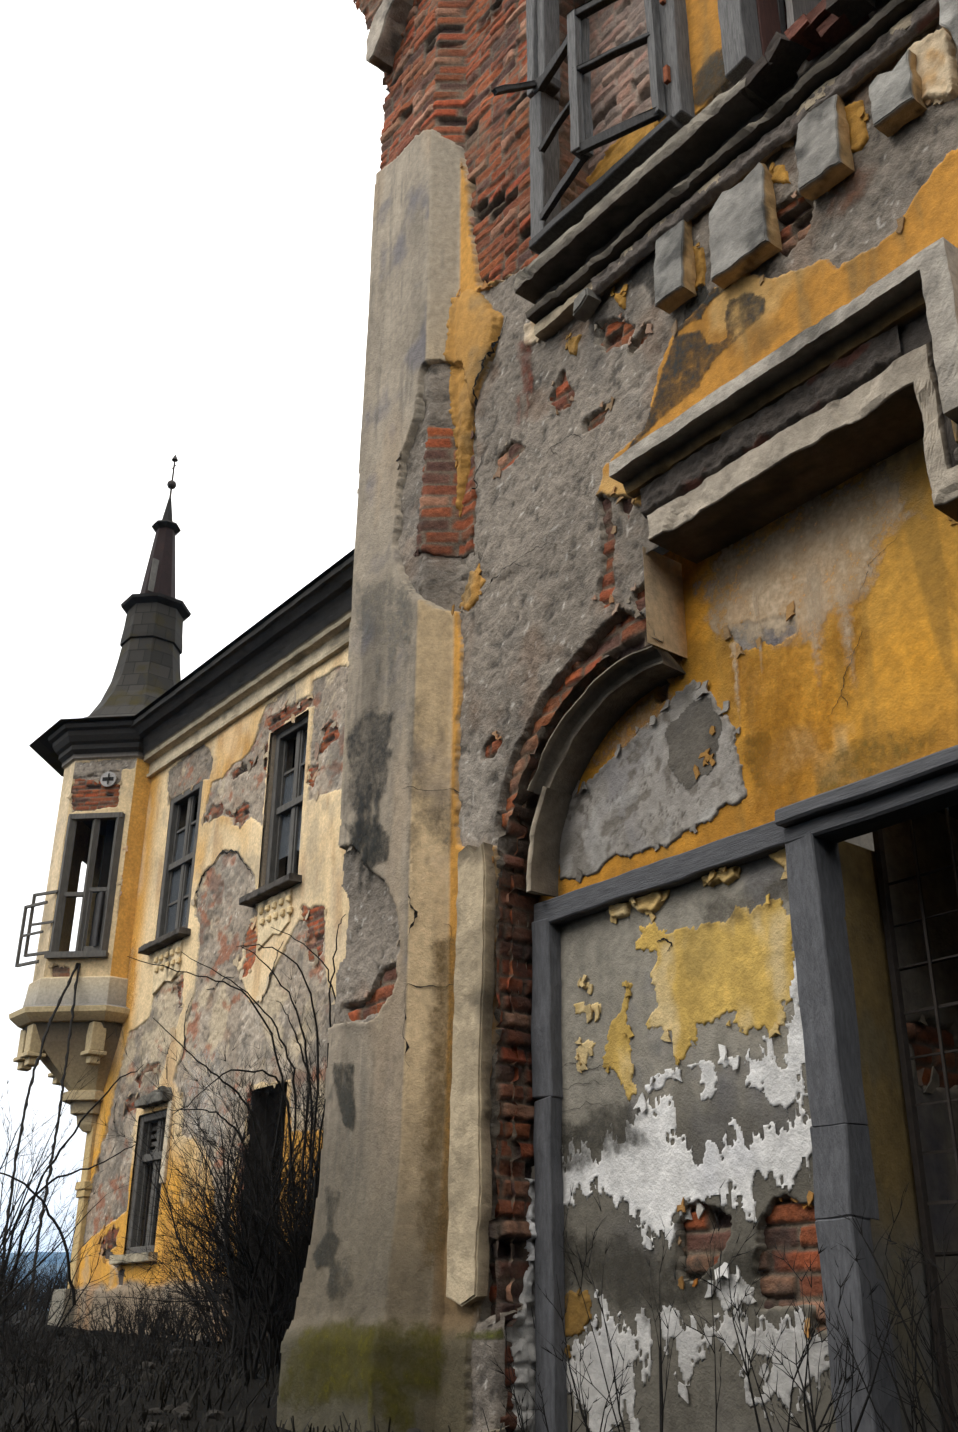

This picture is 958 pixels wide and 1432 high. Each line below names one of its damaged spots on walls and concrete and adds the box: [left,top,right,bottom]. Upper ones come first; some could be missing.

flaking render [868,0,891,18]
flaking render [750,21,958,286]
flaking render [67,758,137,812]
leakage [347,713,392,887]
flaking render [353,0,718,1432]
peeling [559,658,747,883]
peeling [723,600,797,659]
flaking render [84,845,400,1285]
leakage [333,1063,355,1130]
peeling [560,848,836,1432]
flaking render [906,1014,958,1094]